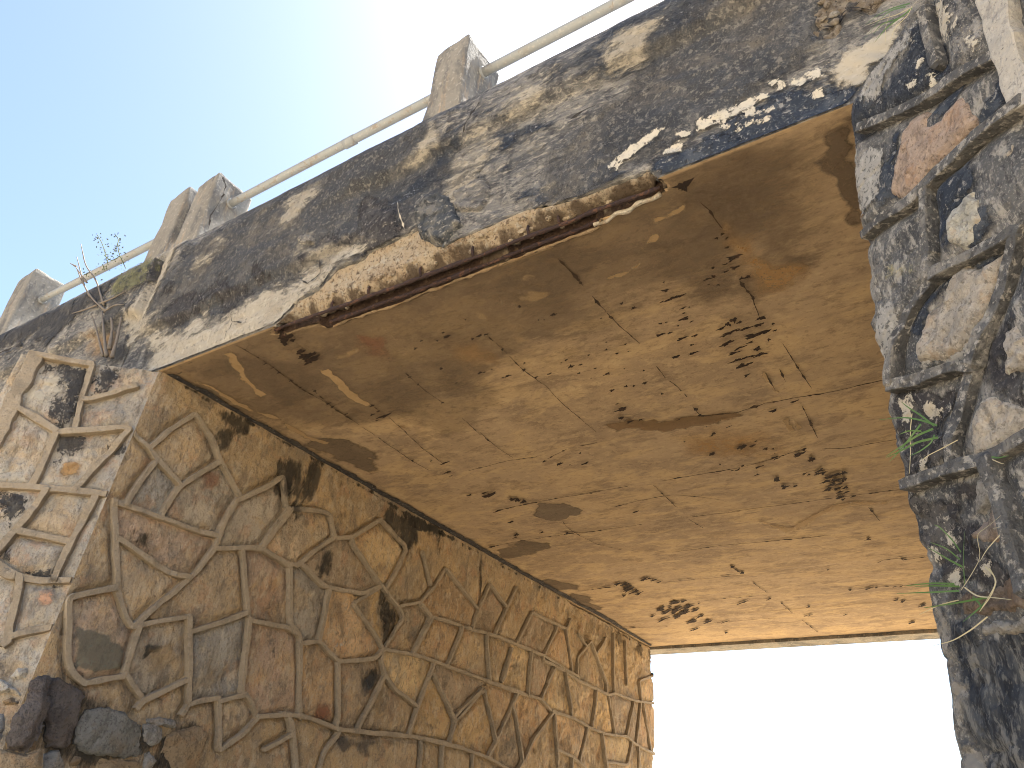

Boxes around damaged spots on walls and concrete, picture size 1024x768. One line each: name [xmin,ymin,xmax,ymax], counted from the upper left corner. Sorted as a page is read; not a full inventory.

water stain [602,17,664,73]
water stain [829,17,916,103]
flaking render [608,62,829,171]
water stain [815,117,900,226]
water stain [123,240,367,397]
crack [224,294,442,470]
spalling [274,172,699,366]
crack [558,259,639,343]
spalling [716,316,777,378]
crack [740,281,759,316]
crack [467,337,896,632]
spalling [650,600,729,634]